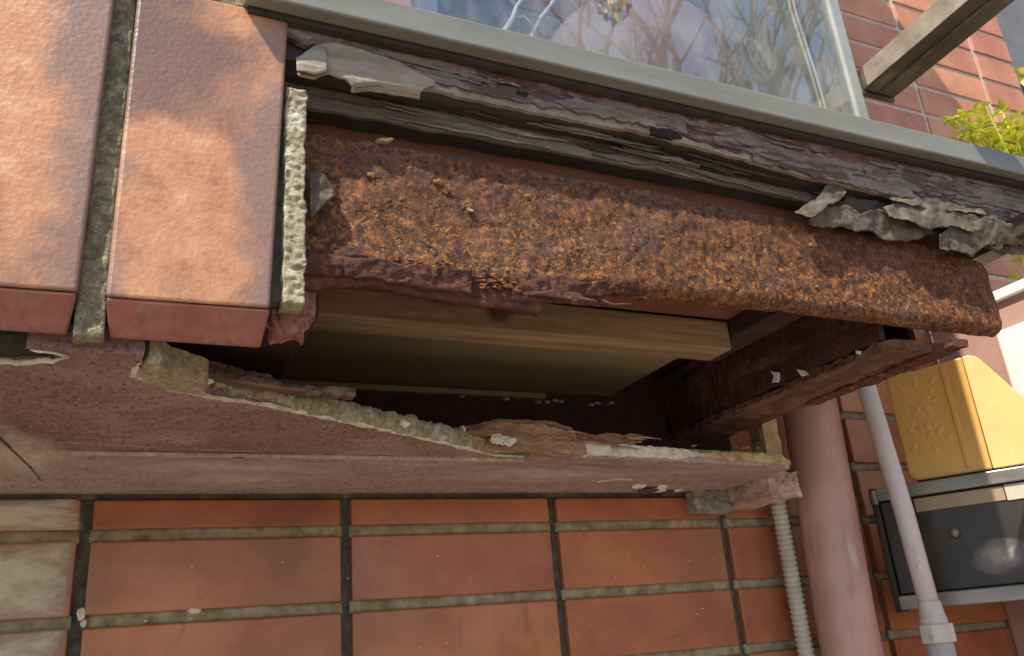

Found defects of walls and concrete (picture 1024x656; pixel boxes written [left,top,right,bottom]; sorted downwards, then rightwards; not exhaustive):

peeling [266,42,1024,345]
rust [304,249,648,317]
peeling [805,337,969,405]
crack [0,431,42,481]
spalling [0,340,803,516]